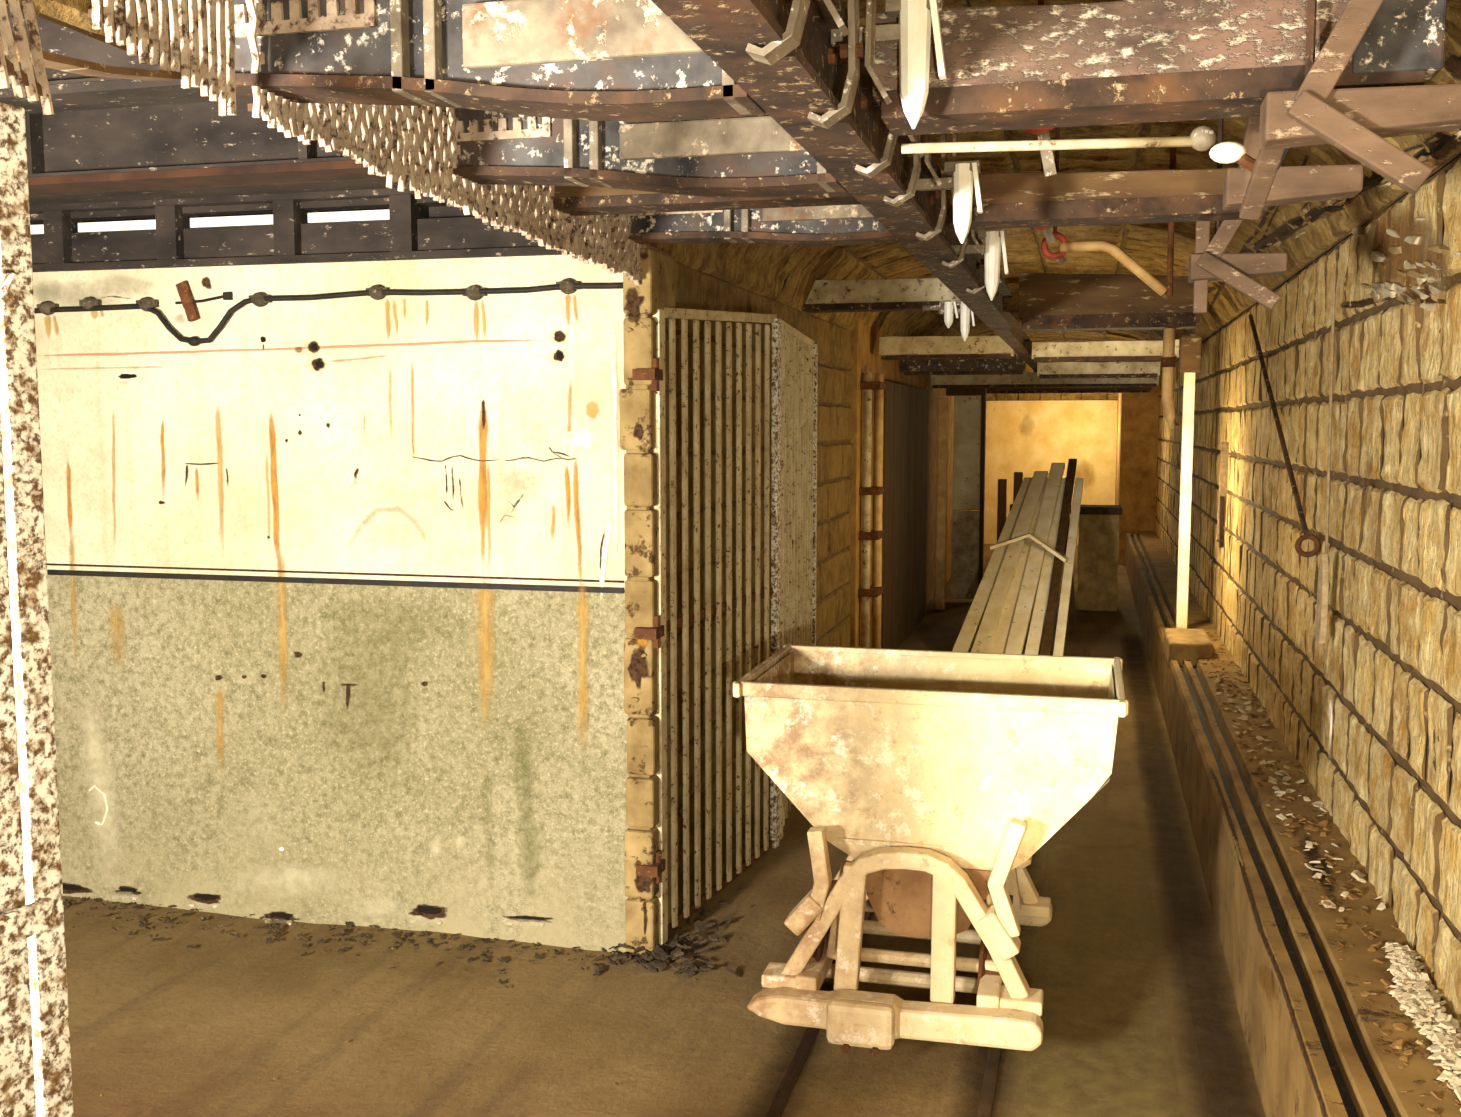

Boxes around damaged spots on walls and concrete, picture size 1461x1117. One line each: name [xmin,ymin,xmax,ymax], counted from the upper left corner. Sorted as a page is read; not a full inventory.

corrosion [266,418,302,671]
corrosion [478,400,490,551]
corrosion [551,463,581,569]
corrosion [480,589,490,697]
corrosion [579,593,587,720]
damp [1302,837,1335,898]